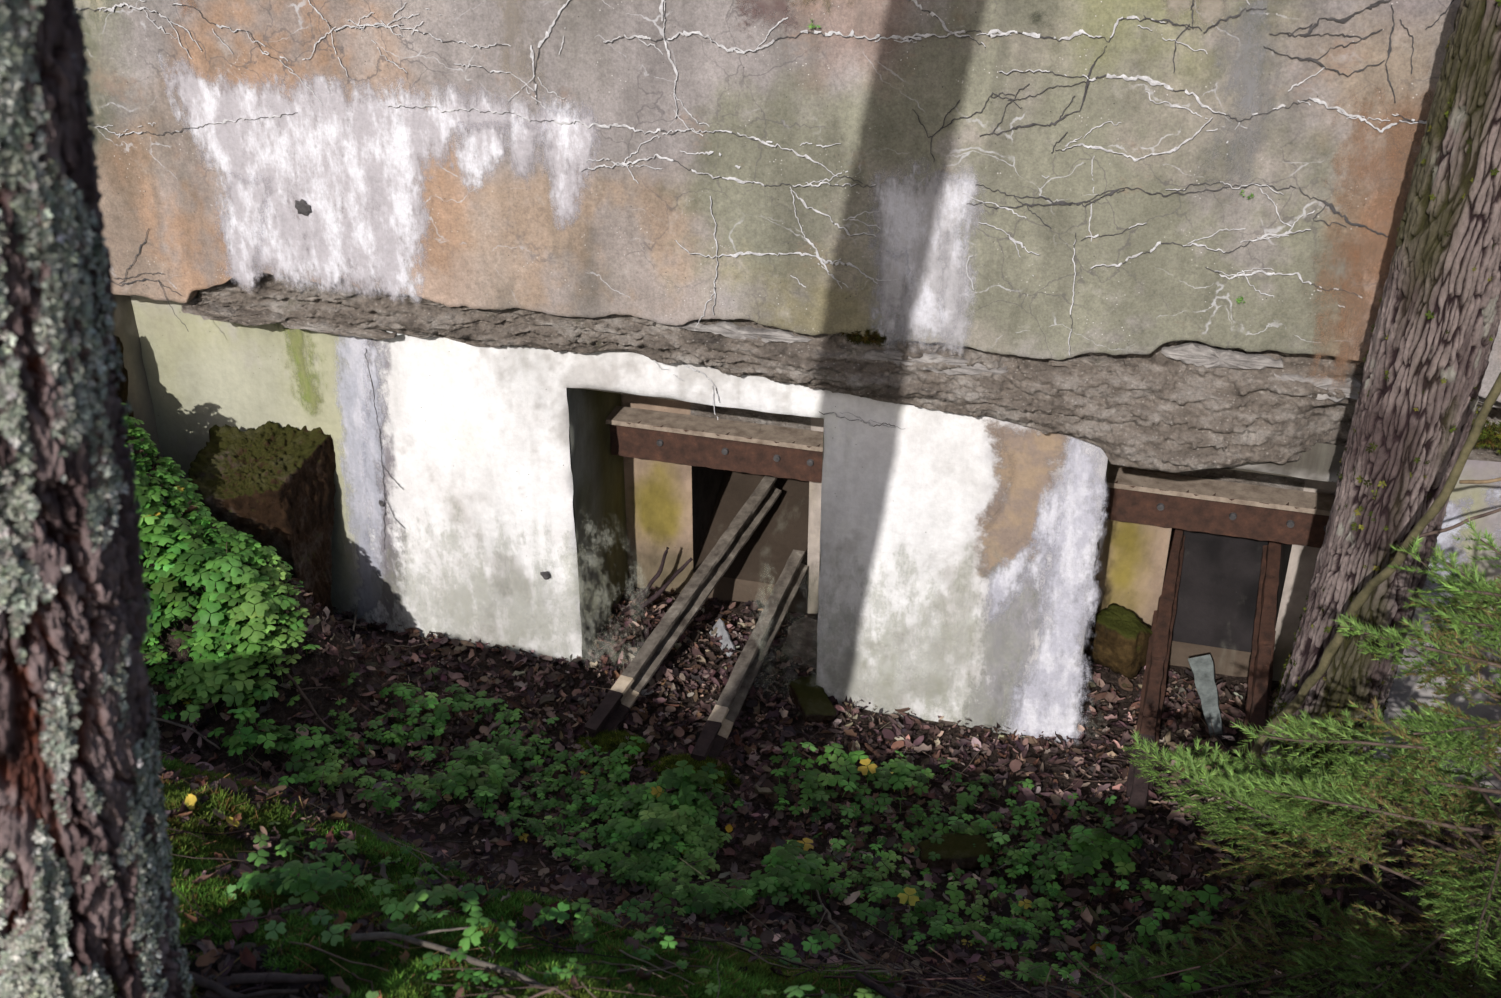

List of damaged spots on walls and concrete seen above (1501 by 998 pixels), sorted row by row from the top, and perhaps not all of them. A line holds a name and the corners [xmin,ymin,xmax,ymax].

damp [164,0,600,300]
crack [653,360,720,420]
crack [76,0,1454,356]
spalling [181,273,1365,577]
crack [820,412,905,429]
damp [869,165,983,353]
spalling [1467,396,1501,462]
damp [964,438,1106,744]